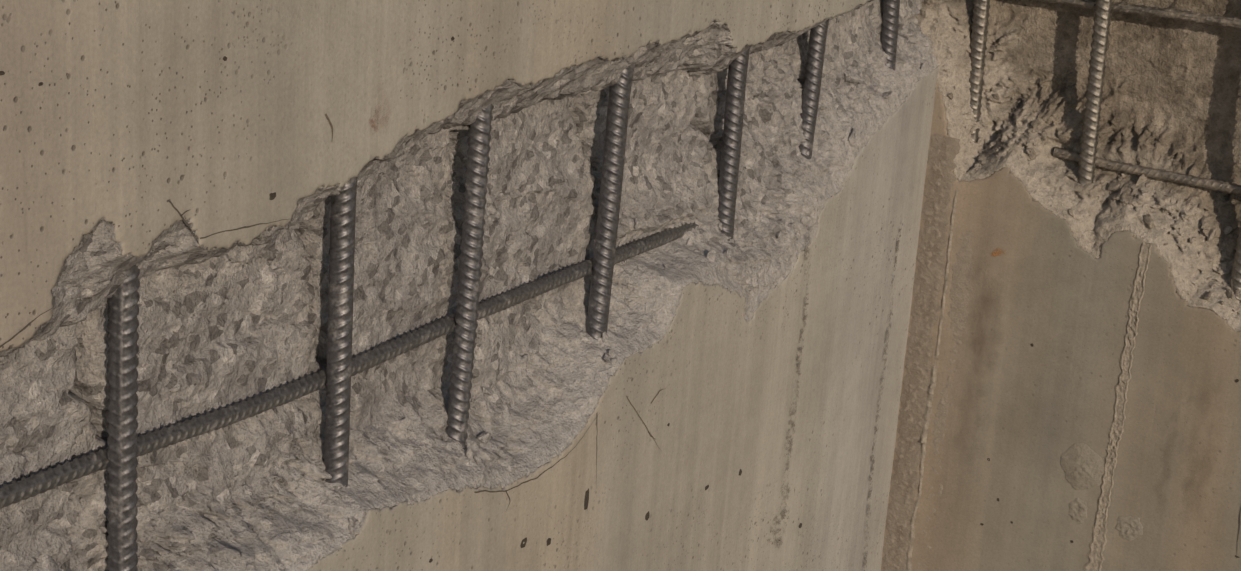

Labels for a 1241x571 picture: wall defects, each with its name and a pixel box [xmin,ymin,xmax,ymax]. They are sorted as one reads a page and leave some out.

spalling [0,0,938,571]
spalling [914,0,1241,331]